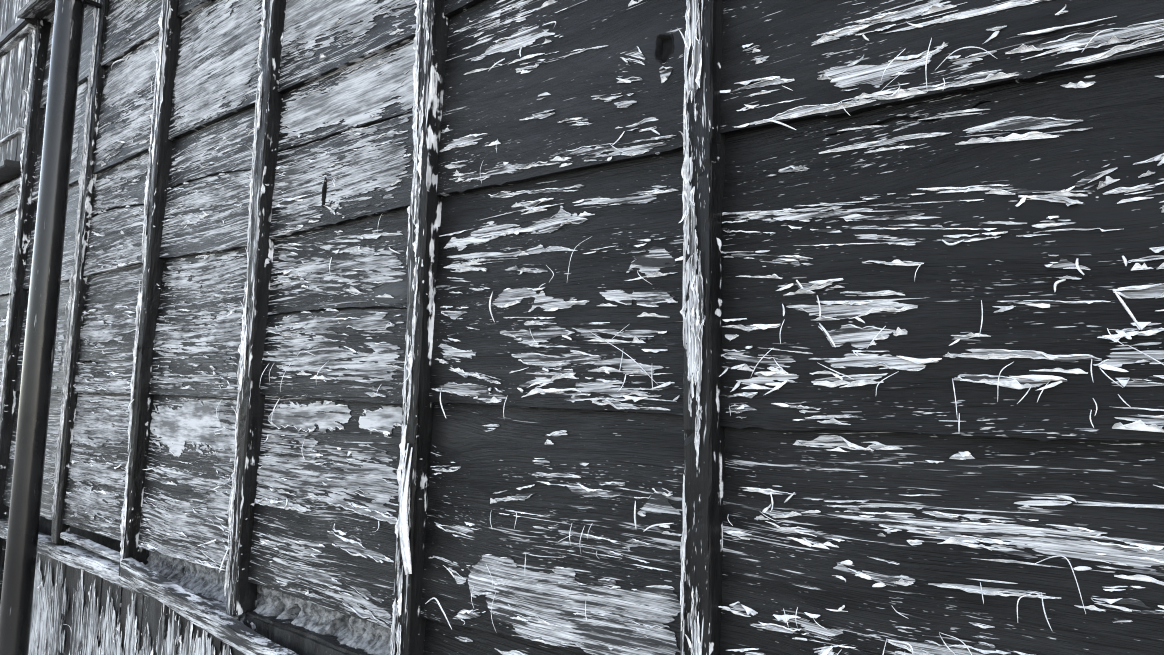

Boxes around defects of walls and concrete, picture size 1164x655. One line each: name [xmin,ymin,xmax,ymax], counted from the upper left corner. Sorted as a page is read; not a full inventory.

peeling [720,0,1164,130]
peeling [819,116,1093,154]
peeling [51,0,163,566]
peeling [138,0,266,595]
peeling [255,0,429,655]
peeling [28,557,232,655]
peeling [425,458,702,655]
peeling [723,514,753,540]
peeling [718,601,856,655]
peeling [742,485,1164,630]
peeling [882,606,1031,655]